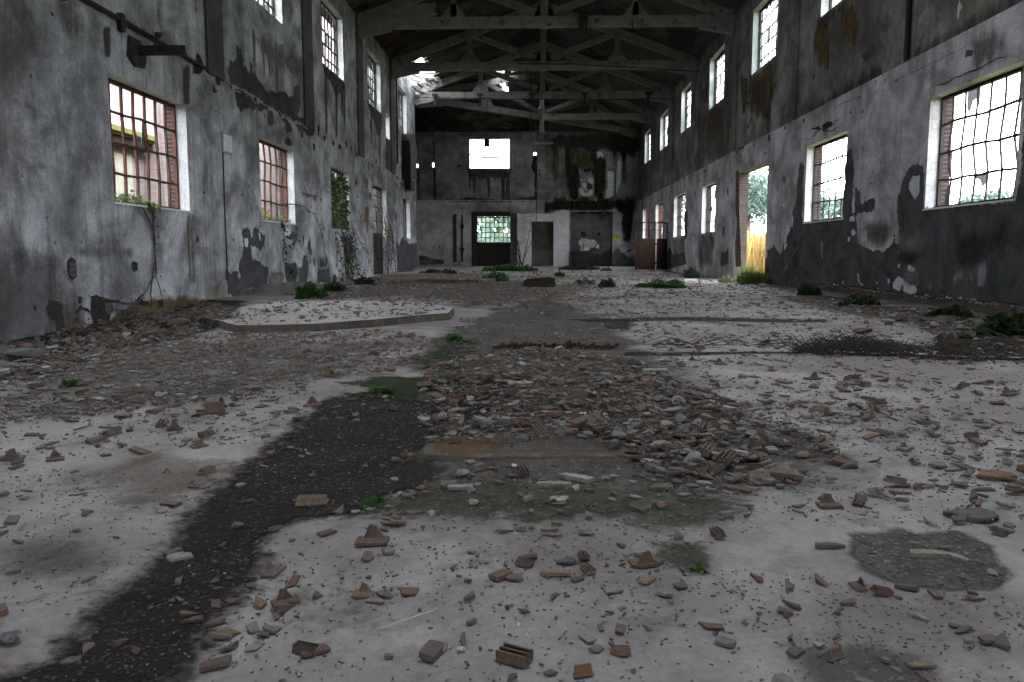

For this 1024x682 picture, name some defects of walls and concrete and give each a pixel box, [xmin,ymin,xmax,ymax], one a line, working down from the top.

peeling [192,43,380,201]
spalling [64,256,114,323]
peeling [224,226,269,296]
peeling [765,132,1024,314]